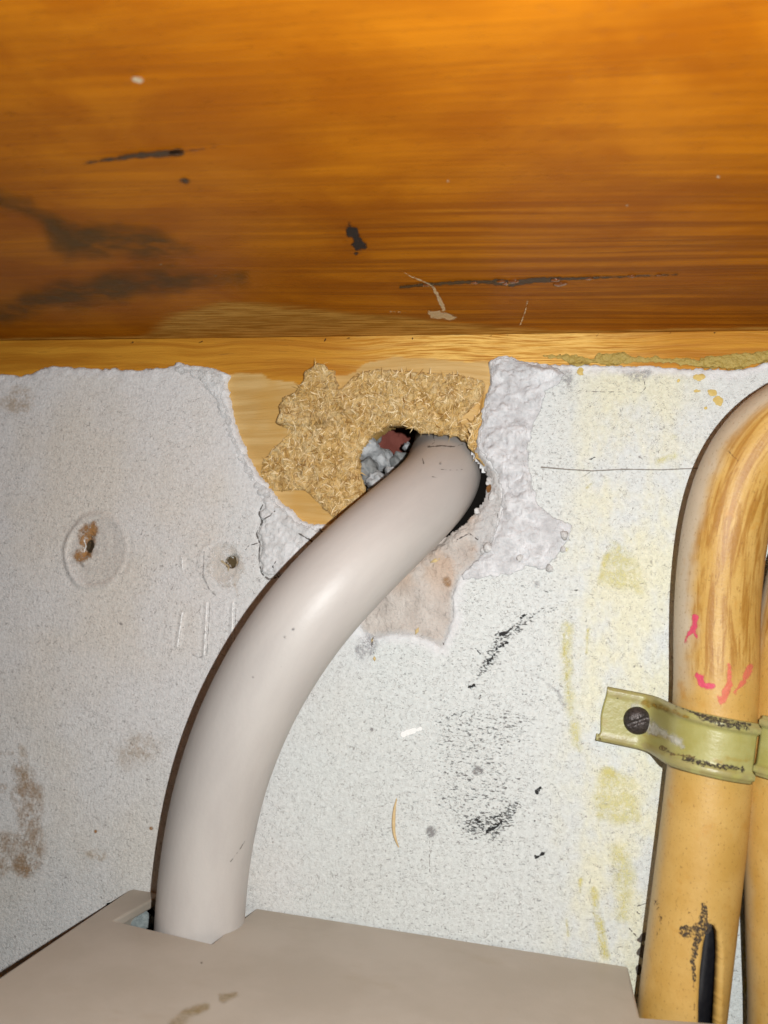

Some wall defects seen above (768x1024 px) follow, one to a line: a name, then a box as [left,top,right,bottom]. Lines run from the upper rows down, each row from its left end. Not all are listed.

water stain [44,218,166,255]
flaking render [175,366,325,576]
flaking render [360,358,572,647]